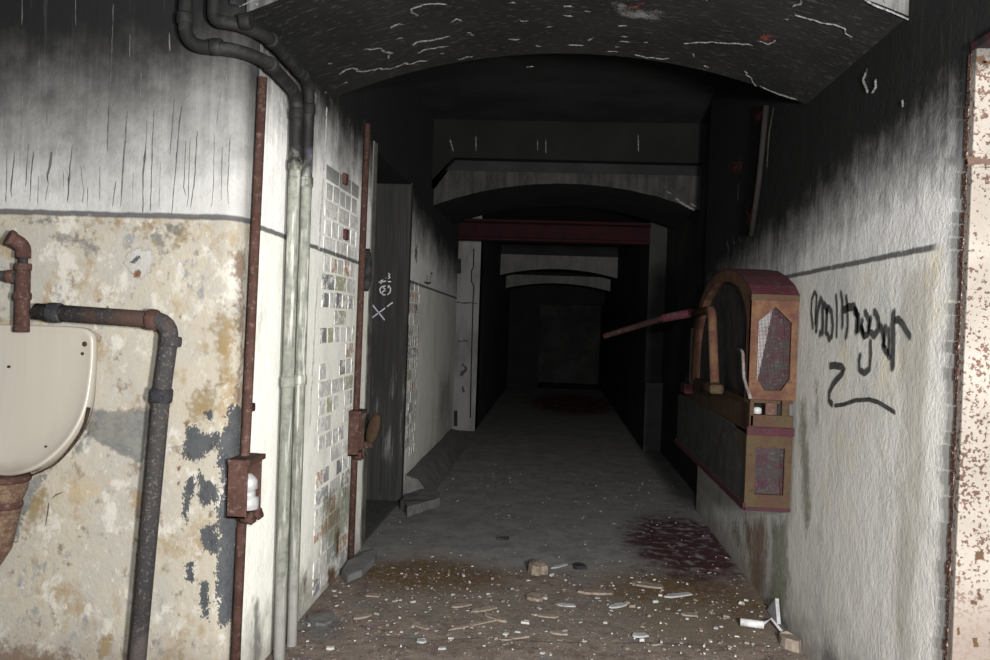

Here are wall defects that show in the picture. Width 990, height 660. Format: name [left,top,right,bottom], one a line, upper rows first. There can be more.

water stain [25,144,52,203]
water stain [63,148,100,203]
water stain [112,111,161,212]
water stain [170,105,198,210]
water stain [211,140,230,206]
corrosion [967,156,990,166]
water stain [218,317,235,380]
peeling [181,403,242,629]
water stain [0,647,70,660]